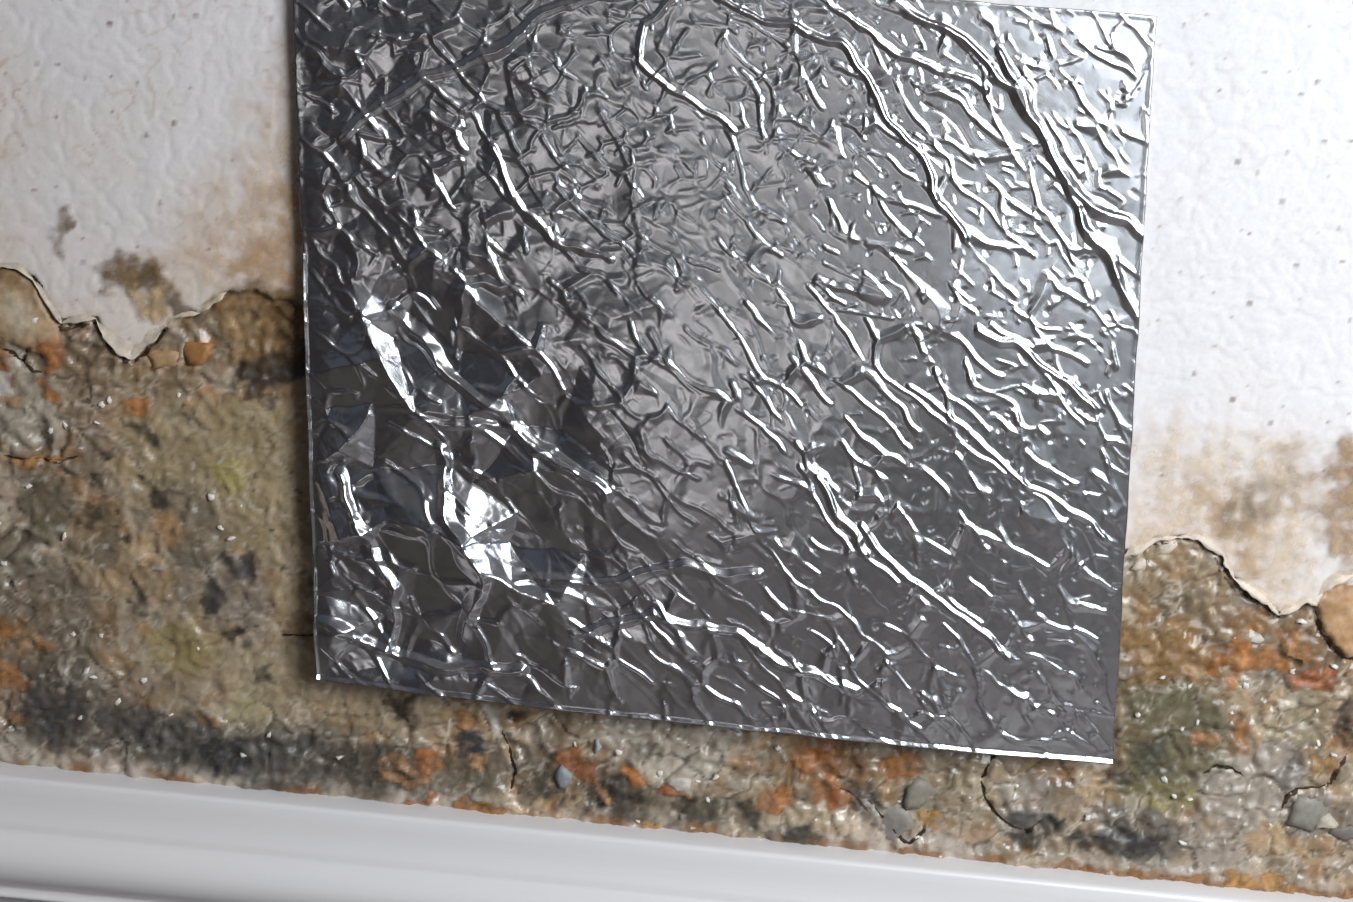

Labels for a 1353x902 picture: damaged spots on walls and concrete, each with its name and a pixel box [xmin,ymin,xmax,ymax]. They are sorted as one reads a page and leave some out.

water stain [55,208,75,254]
water stain [104,251,305,409]
water stain [153,490,167,509]
water stain [1168,438,1353,591]
water stain [201,580,224,613]
water stain [223,553,255,578]
spalling [0,262,1353,898]
water stain [1335,698,1351,737]
water stain [21,686,418,799]
water stain [588,775,652,821]
water stain [784,826,822,845]
water stain [1007,810,1164,858]